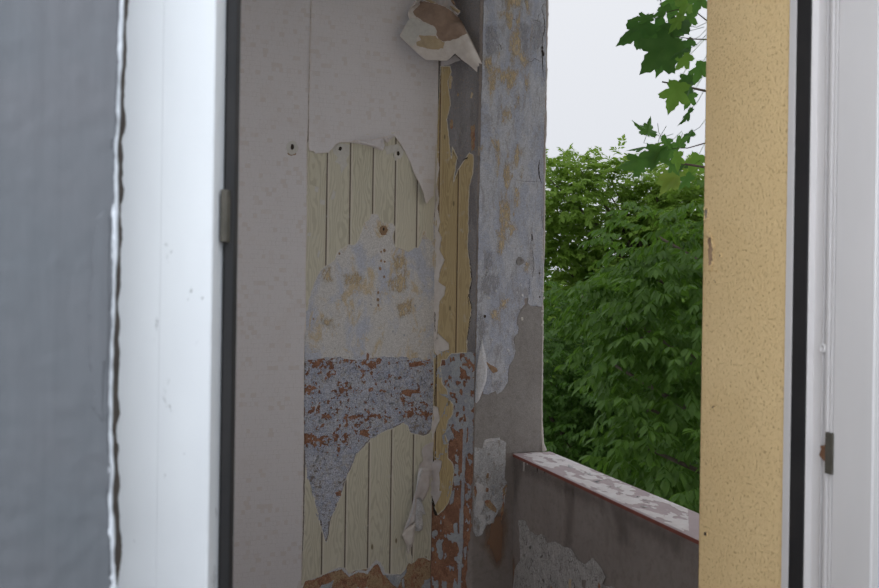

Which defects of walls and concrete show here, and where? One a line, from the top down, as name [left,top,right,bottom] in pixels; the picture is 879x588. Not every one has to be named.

peeling [303,0,689,588]